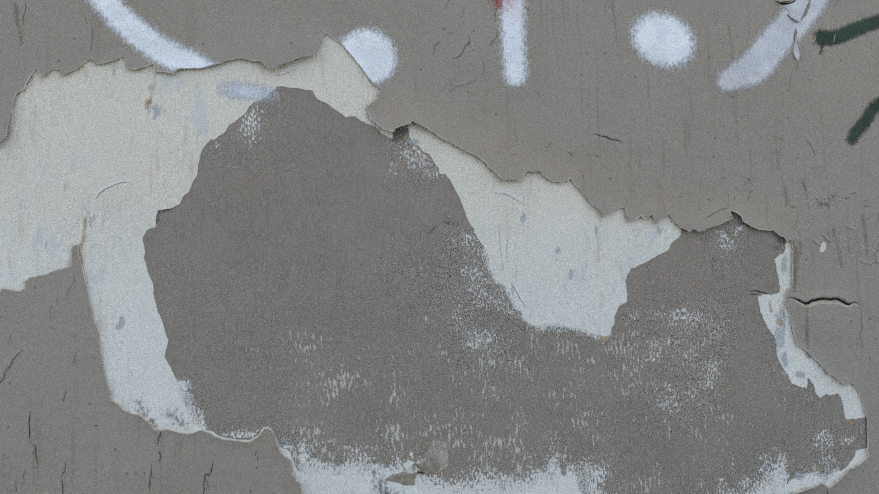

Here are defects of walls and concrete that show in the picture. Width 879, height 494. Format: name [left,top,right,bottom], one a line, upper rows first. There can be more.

peeling [777,0,811,21]
crack [747,286,879,365]
crack [18,411,66,494]
crack [144,430,162,491]
spalling [386,461,440,485]